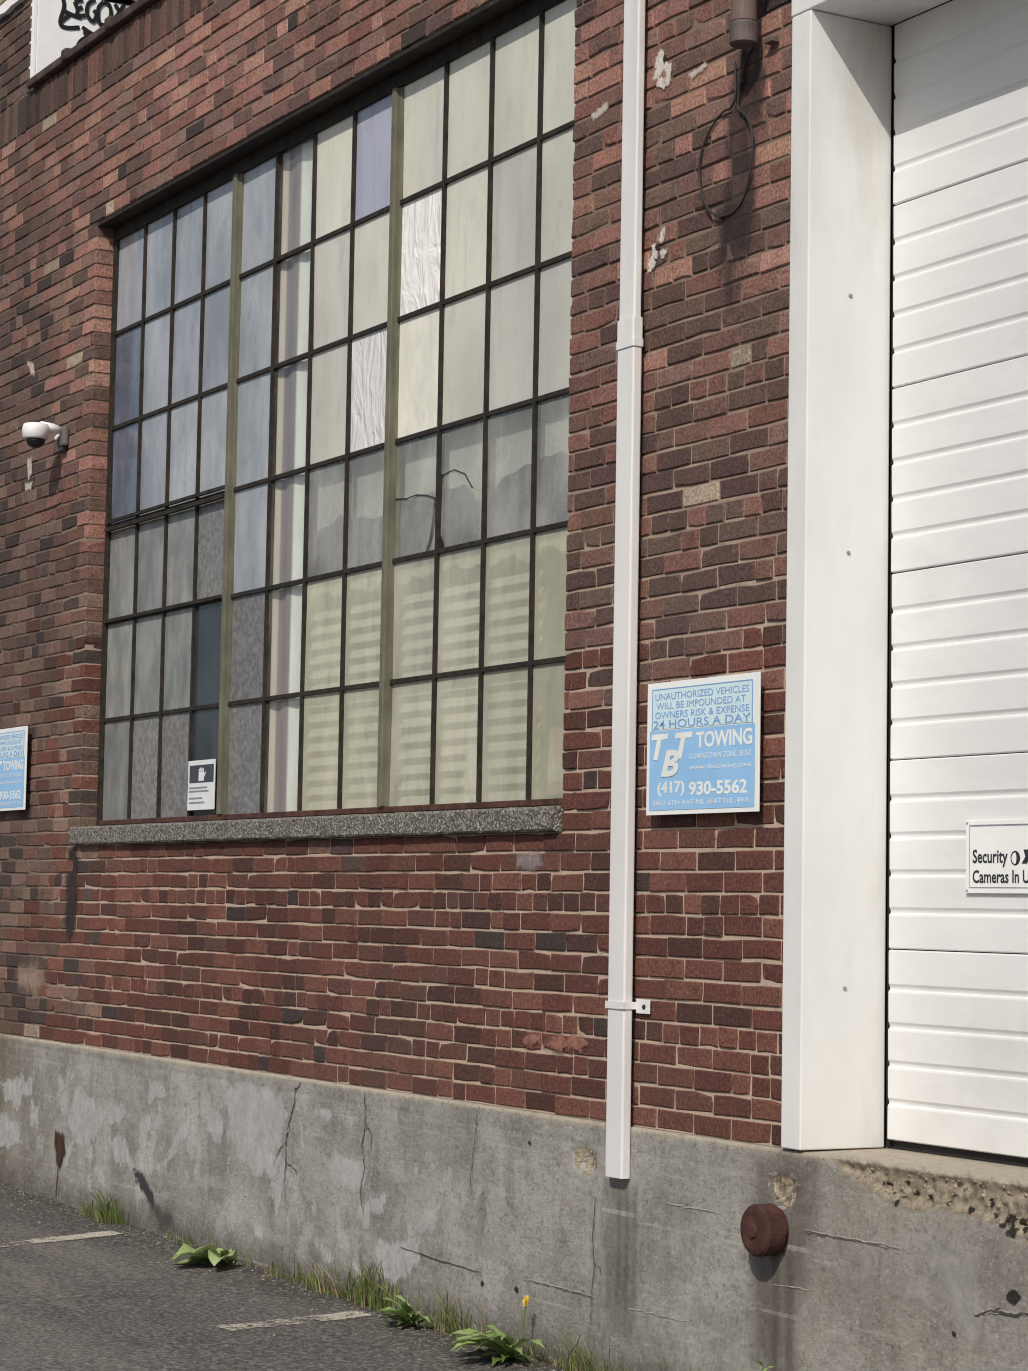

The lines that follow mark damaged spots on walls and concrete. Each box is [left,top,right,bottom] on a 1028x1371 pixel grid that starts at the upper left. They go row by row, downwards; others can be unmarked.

peeling [653,50,672,89]
peeling [647,227,667,272]
rust [54,1130,66,1197]
crack [273,1083,301,1204]
crack [360,1092,372,1216]
damp [133,1168,170,1227]
spalling [772,1176,799,1207]
spalling [836,1160,1028,1245]
crack [401,1247,478,1272]
crack [805,1229,900,1250]
crack [974,1308,1028,1317]